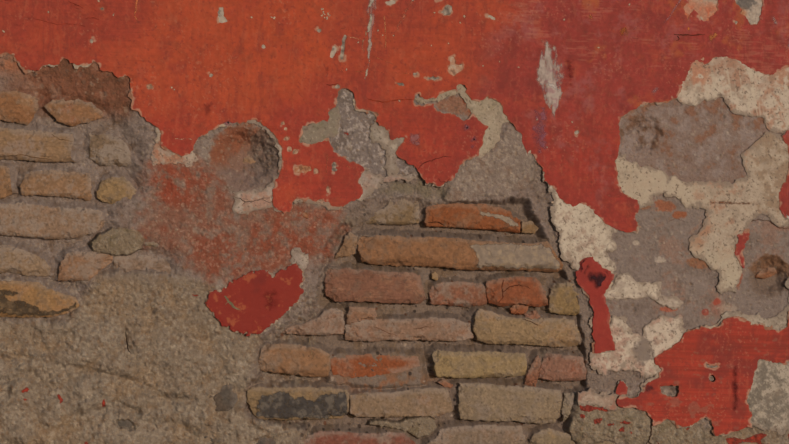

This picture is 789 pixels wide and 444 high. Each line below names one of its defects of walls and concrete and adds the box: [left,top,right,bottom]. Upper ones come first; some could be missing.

peeling [330,35,347,70]
flaking render [0,54,361,336]
flaking render [245,56,789,444]